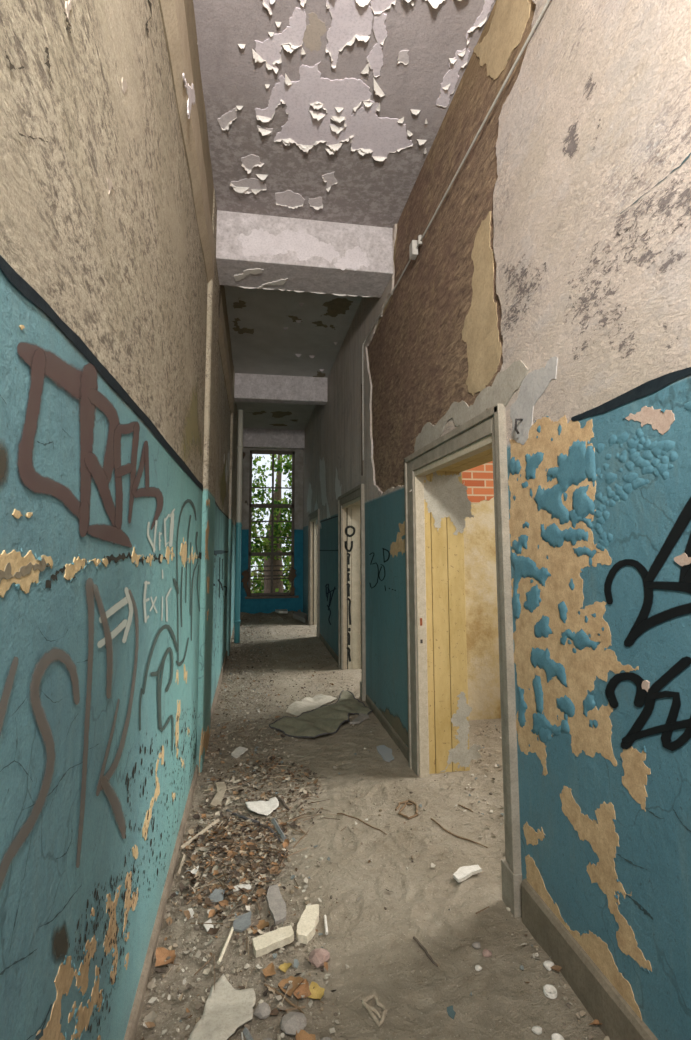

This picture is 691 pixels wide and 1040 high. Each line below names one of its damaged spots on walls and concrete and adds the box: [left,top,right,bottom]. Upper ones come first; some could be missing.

peeling [182,73,195,119]
flaking render [217,0,536,535]
flaking render [0,548,108,598]
flaking render [131,520,224,665]
flaking render [390,521,405,558]
peeling [508,415,651,812]
peeling [440,692,482,773]
peeling [35,700,211,1040]
peeling [523,786,652,1020]